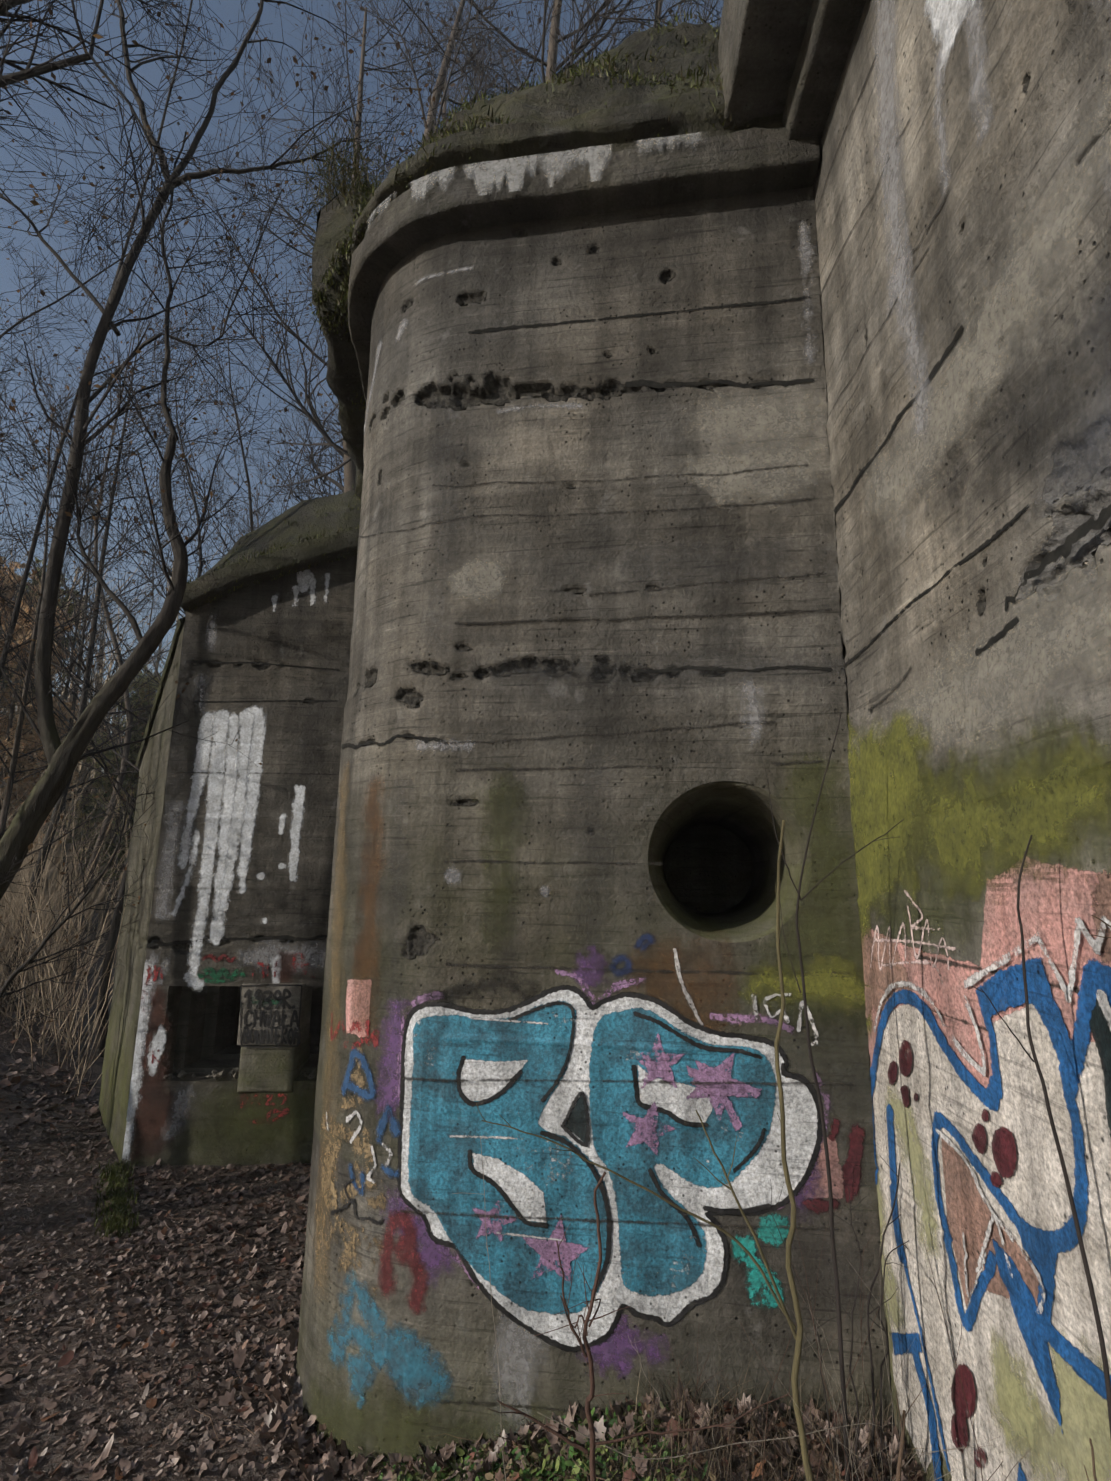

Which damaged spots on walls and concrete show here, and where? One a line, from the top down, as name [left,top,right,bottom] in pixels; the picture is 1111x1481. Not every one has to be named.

spalling [661,269,676,284]
damp [868,0,1111,513]
spalling [369,371,729,432]
crack [455,573,832,625]
crack [634,505,1028,674]
crack [975,504,1111,656]
spalling [354,668,378,697]
spalling [395,656,681,708]
crack [868,666,911,711]
crack [177,721,775,775]
damp [738,581,1111,1033]
spalling [400,925,439,959]